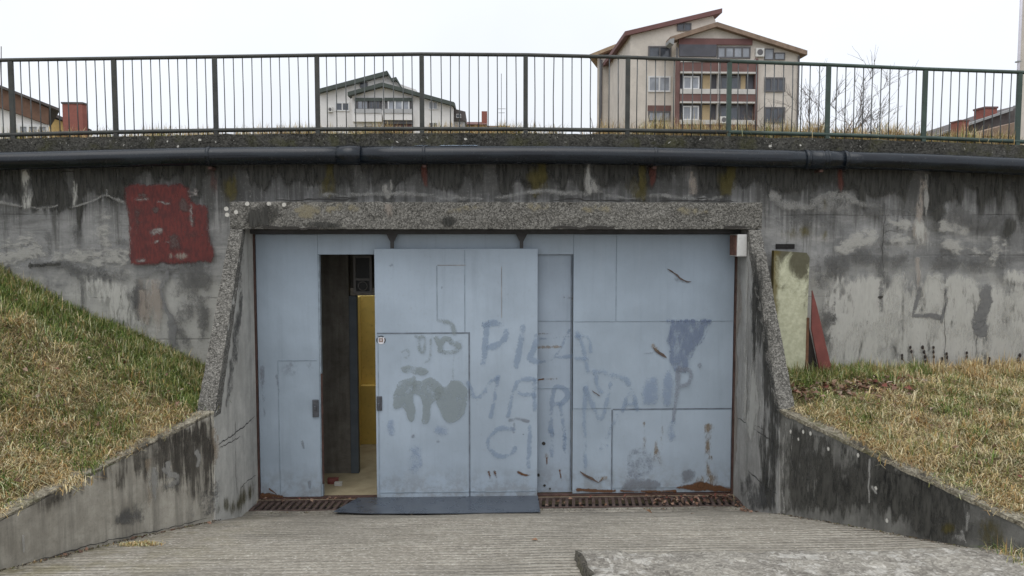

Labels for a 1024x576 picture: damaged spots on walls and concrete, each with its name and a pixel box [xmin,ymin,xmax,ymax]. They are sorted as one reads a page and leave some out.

leakage [0,164,1024,346]
leakage [740,256,970,543]
leakage [33,420,251,515]
crack [218,417,256,487]
leakage [116,509,141,524]